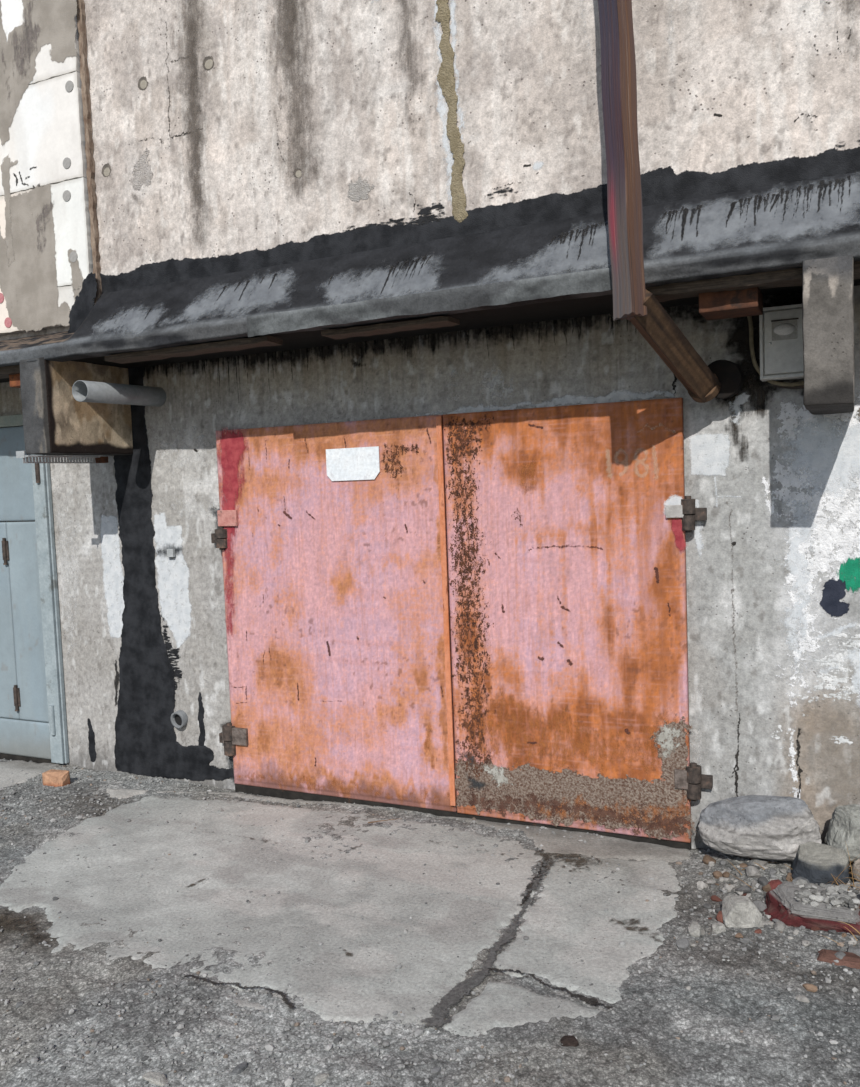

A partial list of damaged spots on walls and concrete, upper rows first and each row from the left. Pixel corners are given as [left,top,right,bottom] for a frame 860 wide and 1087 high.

leakage [181,0,204,242]
leakage [273,0,317,192]
peeling [0,184,71,332]
corrosion [380,443,419,478]
corrosion [443,415,696,840]
peeling [771,394,860,716]
crack [732,639,740,797]
peeling [786,727,801,798]
crack [421,861,612,1028]